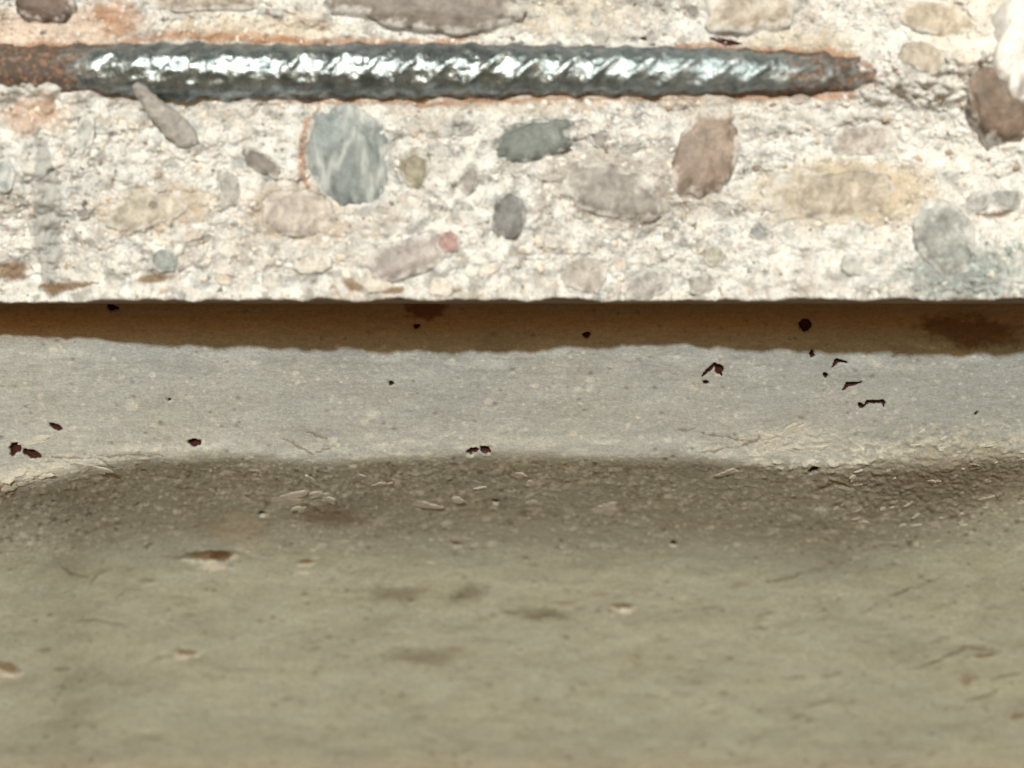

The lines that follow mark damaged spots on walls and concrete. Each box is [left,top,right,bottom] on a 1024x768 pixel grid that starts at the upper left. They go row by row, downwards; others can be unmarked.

spalling [0,0,1024,304]